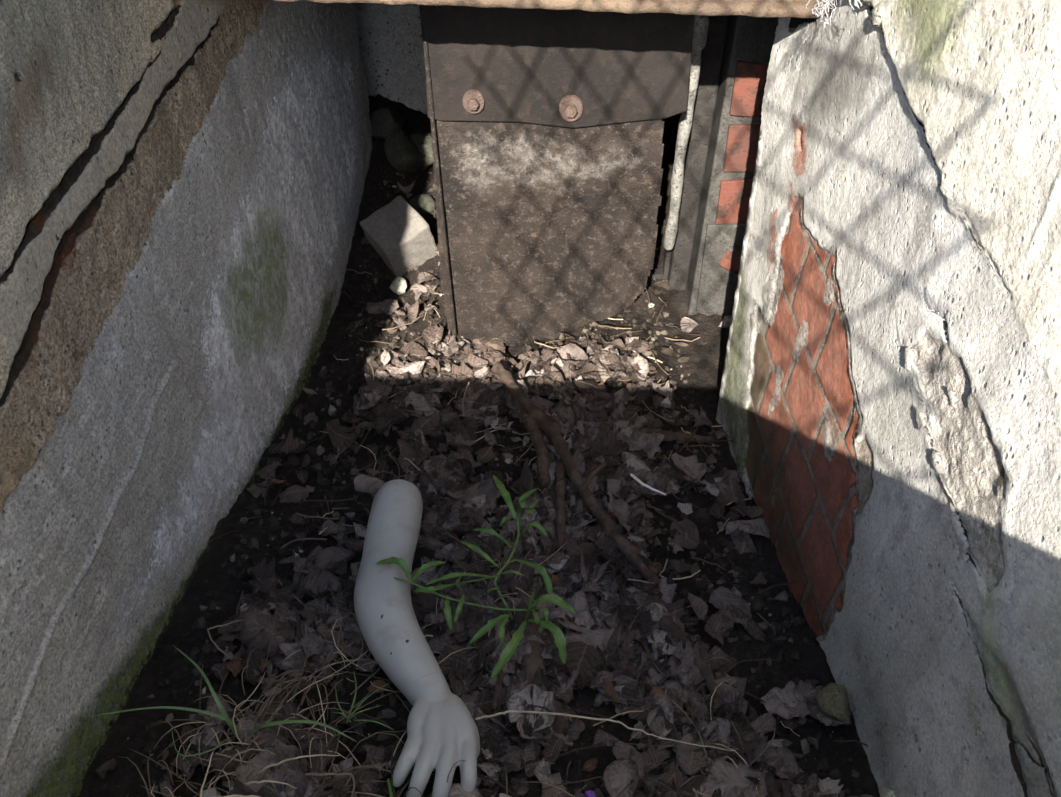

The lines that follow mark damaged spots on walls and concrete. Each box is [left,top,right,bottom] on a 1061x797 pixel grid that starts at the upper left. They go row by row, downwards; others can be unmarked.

crack [0,0,220,407]
water stain [121,42,360,622]
flaking render [741,114,873,640]
spalling [900,306,1007,592]
crack [952,585,1056,797]